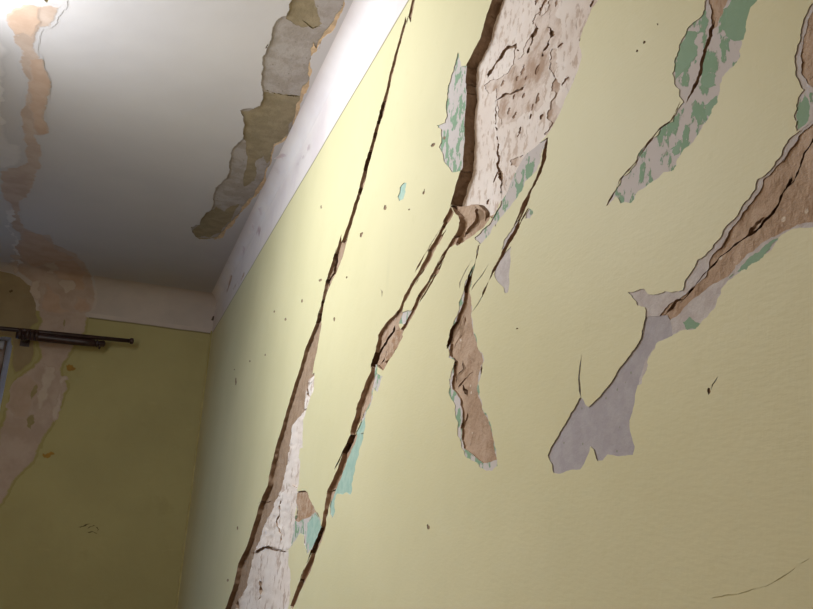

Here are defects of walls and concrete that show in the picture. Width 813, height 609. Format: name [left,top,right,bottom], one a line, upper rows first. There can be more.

water stain [0,270,39,375]
flaking render [0,341,77,507]
flaking render [0,0,98,334]
peeling [191,0,345,240]
crack [226,0,458,609]
crack [459,138,548,312]
flaking render [431,0,598,471]